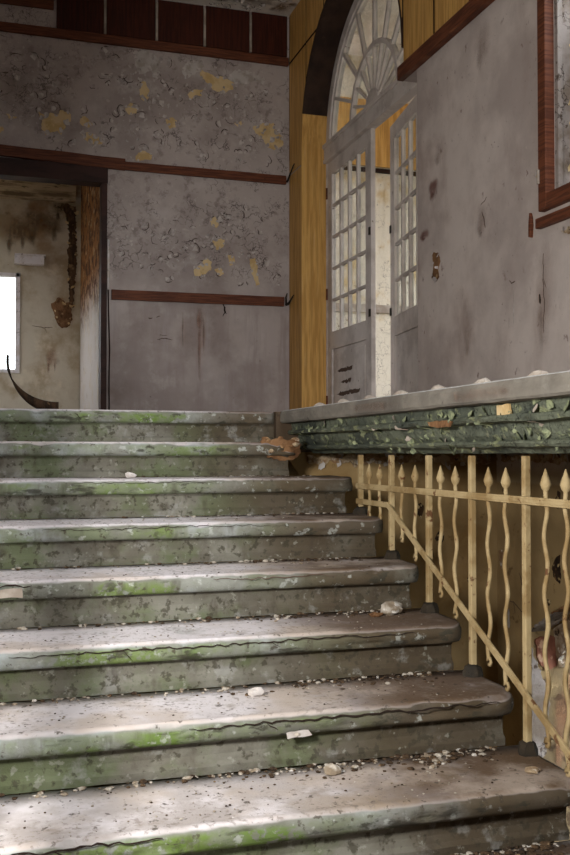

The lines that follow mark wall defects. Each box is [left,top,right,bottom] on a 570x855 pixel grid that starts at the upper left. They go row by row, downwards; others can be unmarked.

peeling [0,50,268,162]
spalling [51,203,79,328]
peeling [115,205,270,286]
spalling [431,252,440,284]
spalling [260,411,570,470]
spalling [497,403,512,415]
peeling [512,399,570,440]